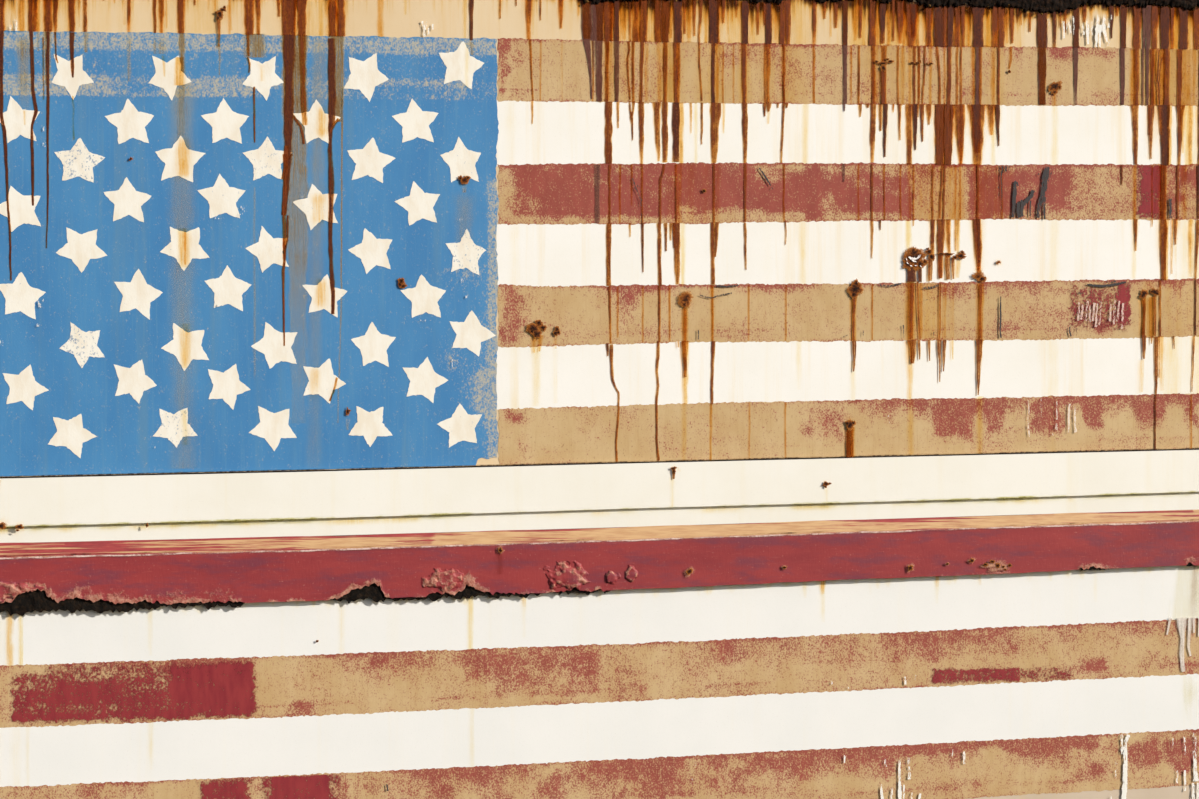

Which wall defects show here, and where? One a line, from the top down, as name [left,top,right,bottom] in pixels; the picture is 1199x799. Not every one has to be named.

corrosion [153,0,196,114]
corrosion [215,6,226,48]
corrosion [245,0,264,69]
corrosion [278,0,308,346]
corrosion [328,0,345,320]
corrosion [578,0,1199,479]
corrosion [526,320,561,339]
corrosion [968,558,1012,572]